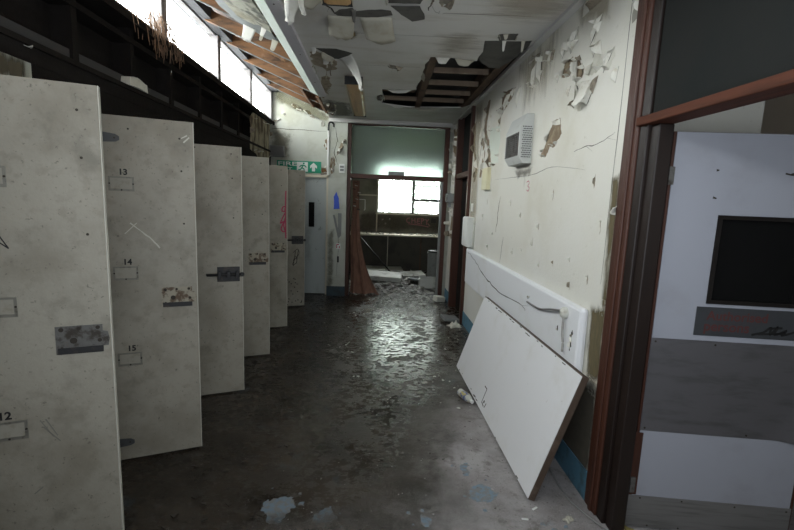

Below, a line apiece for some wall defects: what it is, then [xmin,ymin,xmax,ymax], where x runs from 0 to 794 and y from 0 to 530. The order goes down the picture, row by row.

peeling [284,0,321,26]
peeling [321,139,346,174]
peeling [310,0,454,114]
peeling [470,12,619,182]
crack [505,0,633,278]